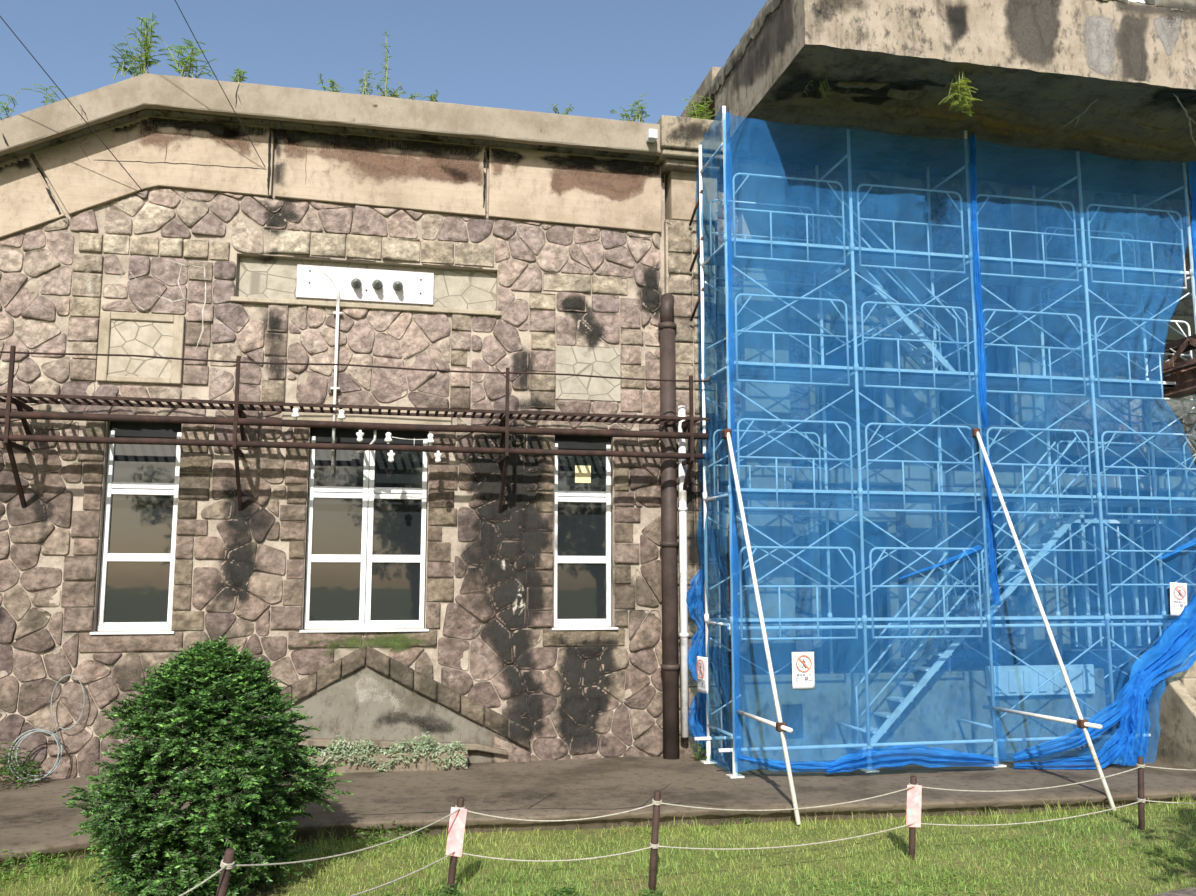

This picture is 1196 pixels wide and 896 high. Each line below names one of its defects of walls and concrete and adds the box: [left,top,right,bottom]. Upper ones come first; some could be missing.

water stain [947,5,967,41]
water stain [1006,0,1059,65]
water stain [1087,2,1196,81]
water stain [1149,89,1196,109]
water stain [271,121,283,182]
water stain [563,297,602,347]
water stain [513,350,532,386]
water stain [463,399,553,740]
water stain [557,638,617,751]